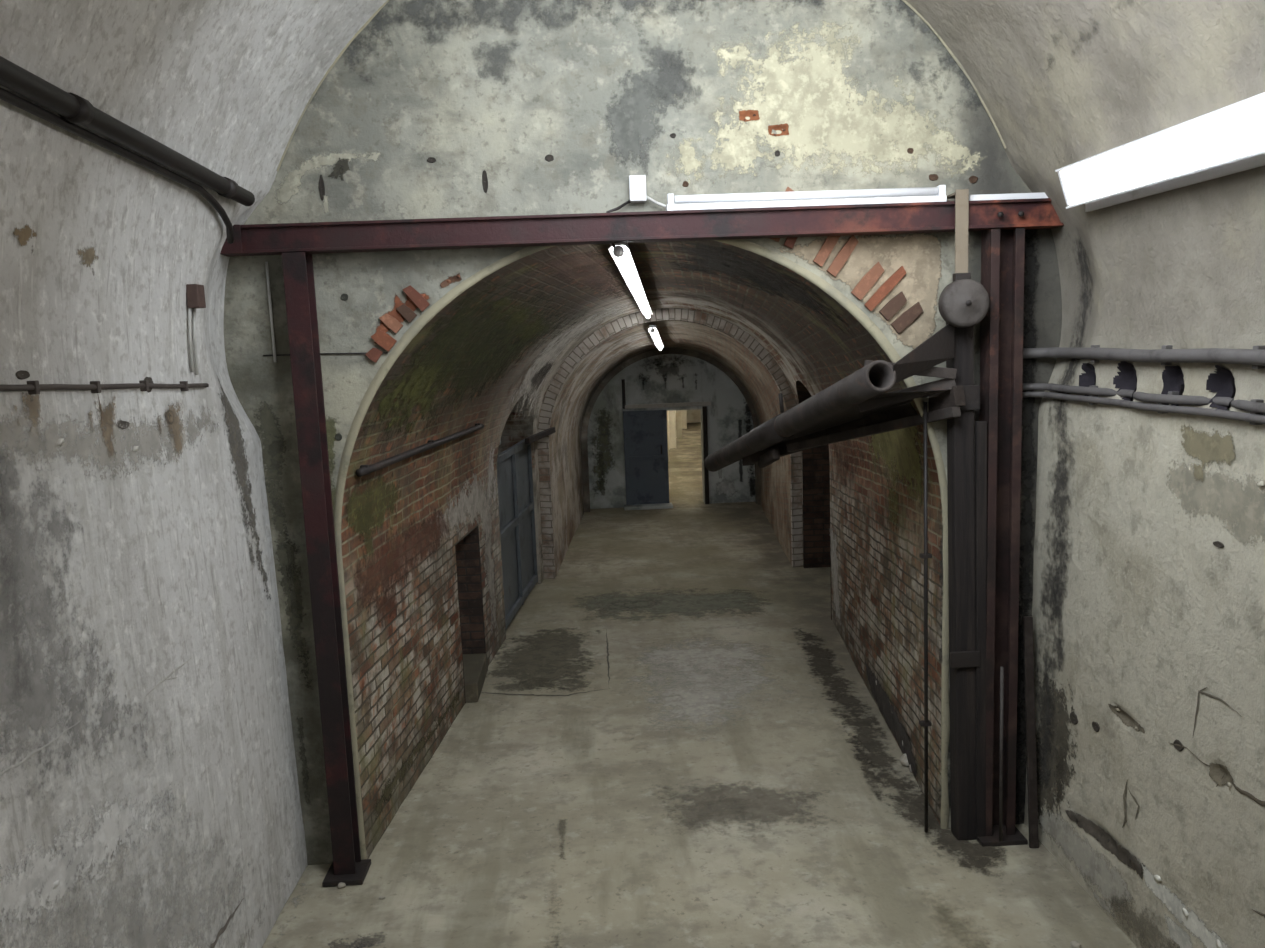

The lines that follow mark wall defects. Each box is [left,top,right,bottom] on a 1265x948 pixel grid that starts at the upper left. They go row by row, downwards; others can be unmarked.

damp [606,44,701,173]
flaking render [666,21,980,183]
flaking render [365,273,462,363]
flaking render [769,233,942,349]
damp [437,444,592,691]
damp [1055,535,1067,665]
crack [1170,687,1265,806]